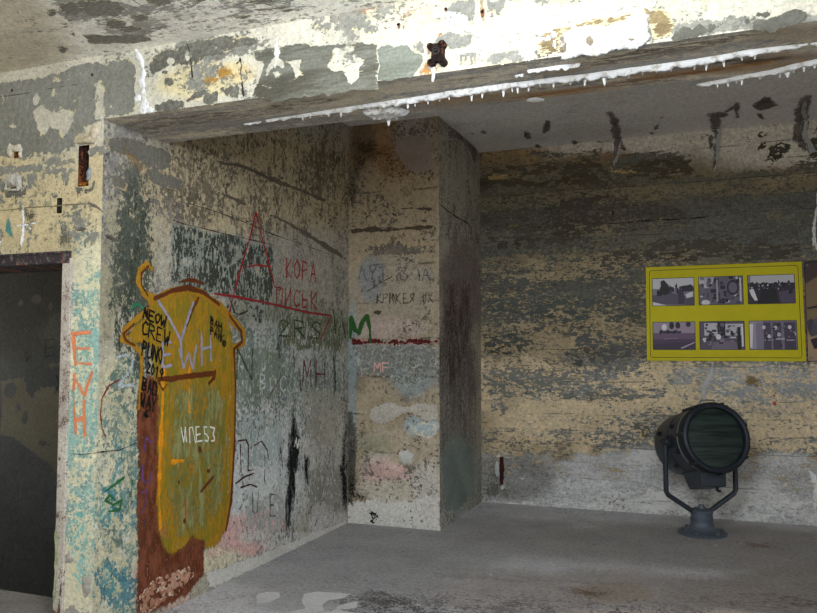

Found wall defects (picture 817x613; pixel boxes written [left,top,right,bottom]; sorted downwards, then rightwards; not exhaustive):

peeling [47,0,151,44]
peeling [435,31,482,82]
leakage [244,0,817,126]
peeling [536,11,634,56]
peeling [578,7,817,67]
peeling [0,16,424,212]
leakage [447,128,477,164]
leakage [606,111,626,173]
leakage [706,102,740,172]
leakage [792,95,815,154]
peeling [481,277,654,416]
peeling [0,376,59,474]